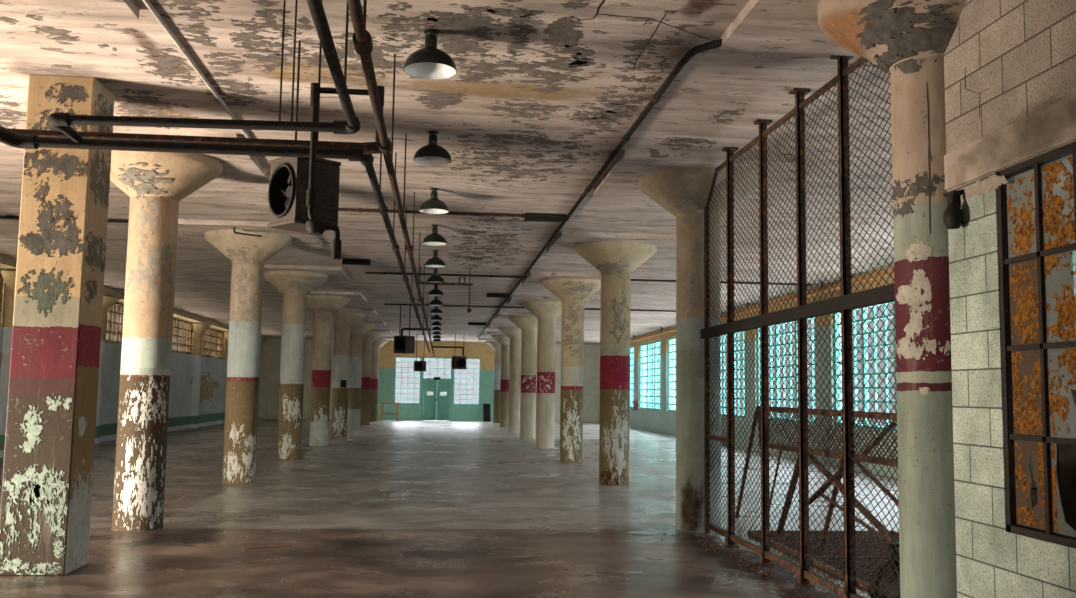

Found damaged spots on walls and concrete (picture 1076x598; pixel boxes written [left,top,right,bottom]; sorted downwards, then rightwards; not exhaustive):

crack [571,0,715,71]
peeling [856,0,957,77]
peeling [0,0,686,191]
peeling [17,149,176,317]
peeling [559,260,630,356]
peeling [895,240,951,360]
peeling [0,393,93,575]
peeling [114,371,168,530]
peeling [224,423,256,483]
peeling [279,393,347,459]
peeling [563,386,582,462]
peeling [600,385,629,485]